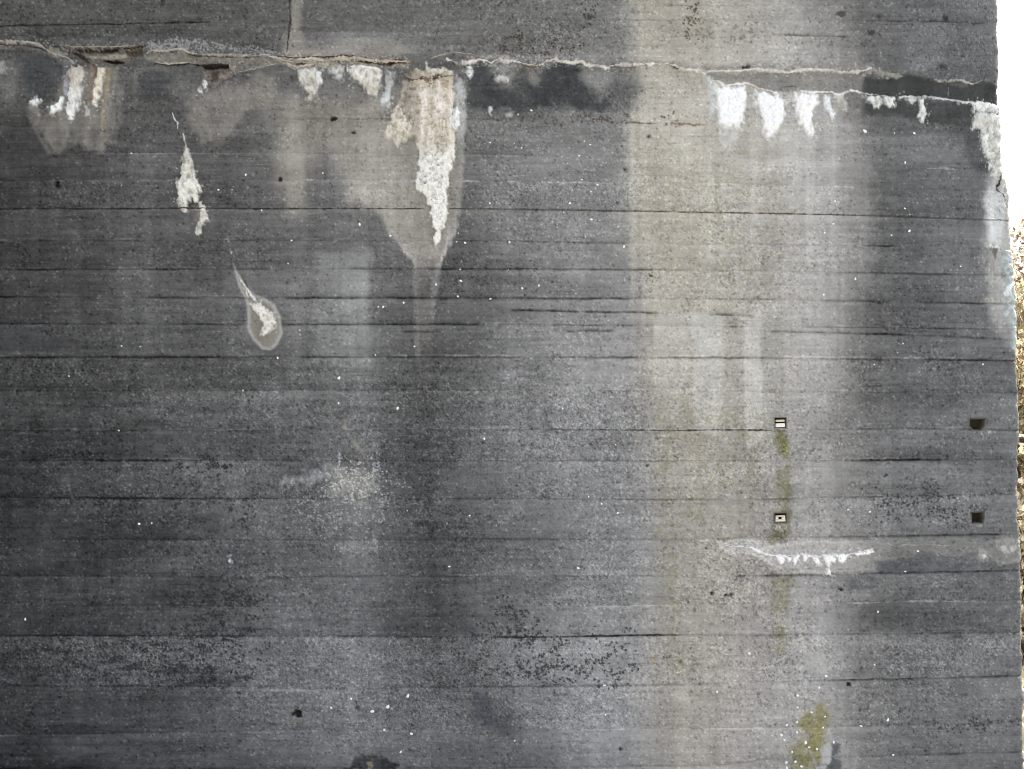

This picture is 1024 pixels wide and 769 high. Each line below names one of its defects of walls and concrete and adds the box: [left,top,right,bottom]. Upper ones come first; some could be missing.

water stain [0,51,128,156]
water stain [130,64,172,108]
crack [0,0,982,106]
water stain [610,0,876,66]
water stain [171,61,1021,769]